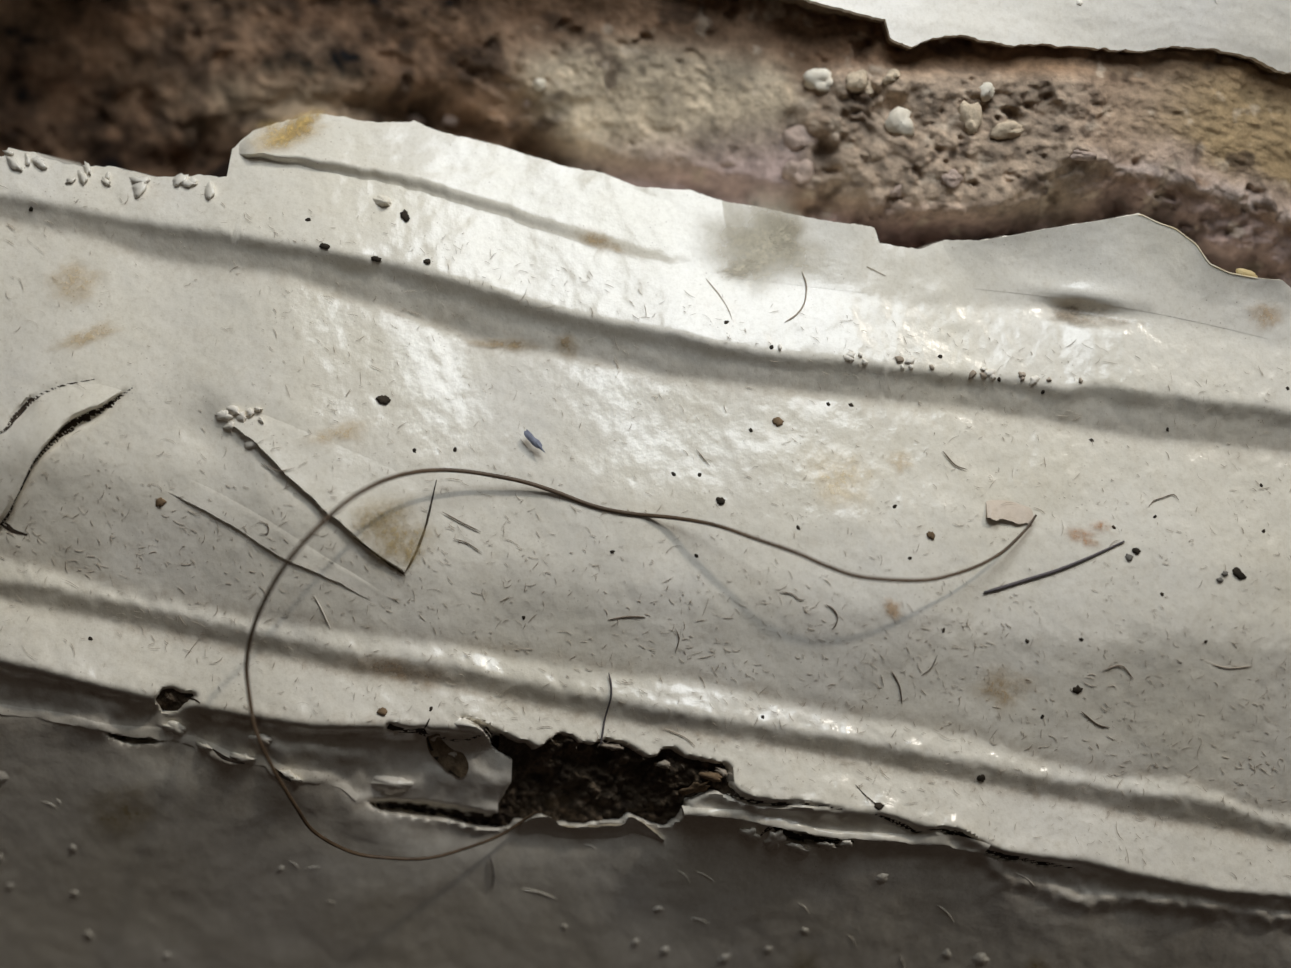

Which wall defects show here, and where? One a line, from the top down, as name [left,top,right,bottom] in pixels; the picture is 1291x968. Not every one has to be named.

spalling [0,0,1291,340]
crack [0,379,132,536]
spalling [0,689,990,855]